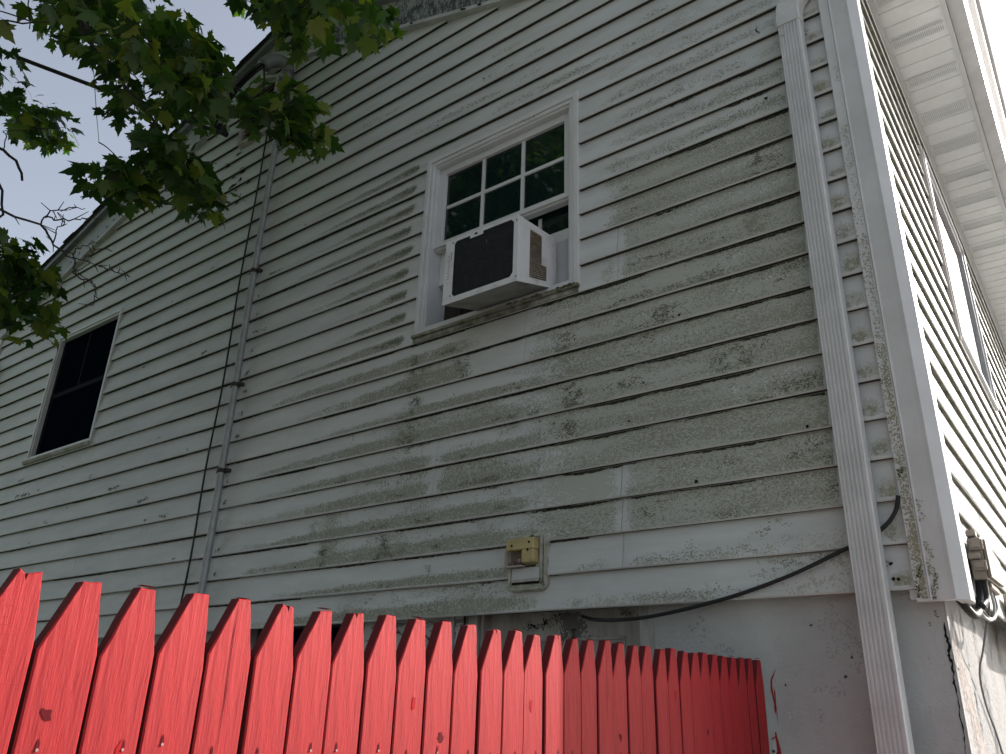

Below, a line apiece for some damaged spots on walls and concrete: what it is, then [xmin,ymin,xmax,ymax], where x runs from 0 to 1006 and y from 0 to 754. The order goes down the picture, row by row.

mould [378,0,489,28]
water stain [549,332,586,439]
water stain [601,264,724,358]
water stain [822,124,939,600]
crack [944,622,966,754]